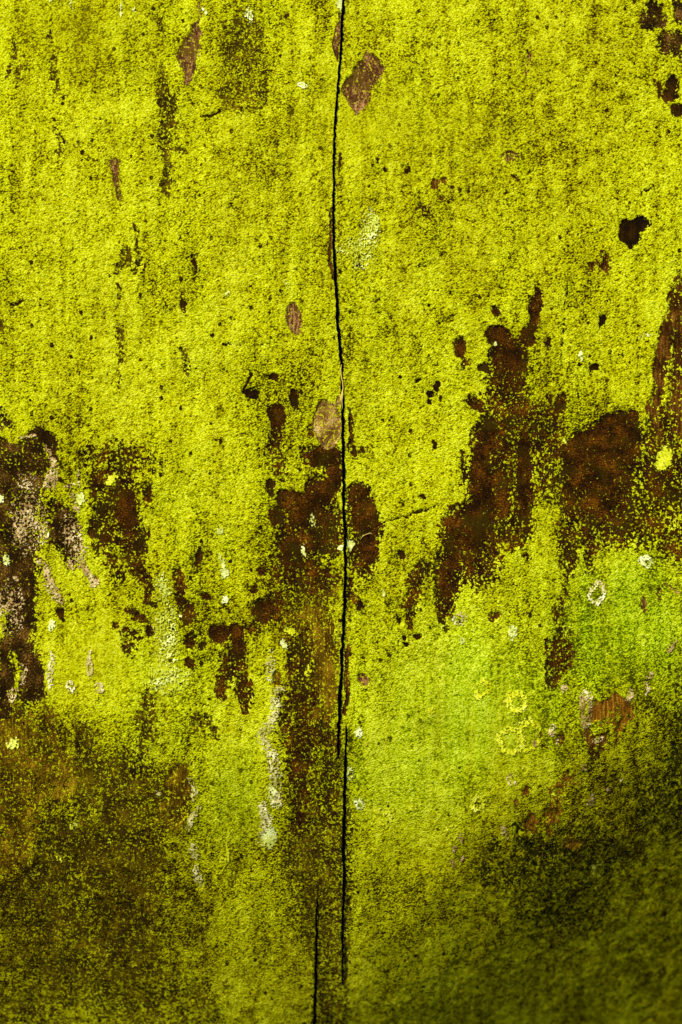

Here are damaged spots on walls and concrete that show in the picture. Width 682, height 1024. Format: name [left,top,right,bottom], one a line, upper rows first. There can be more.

peeling [341,51,384,115]
crack [313,0,348,1024]
water stain [542,595,575,691]